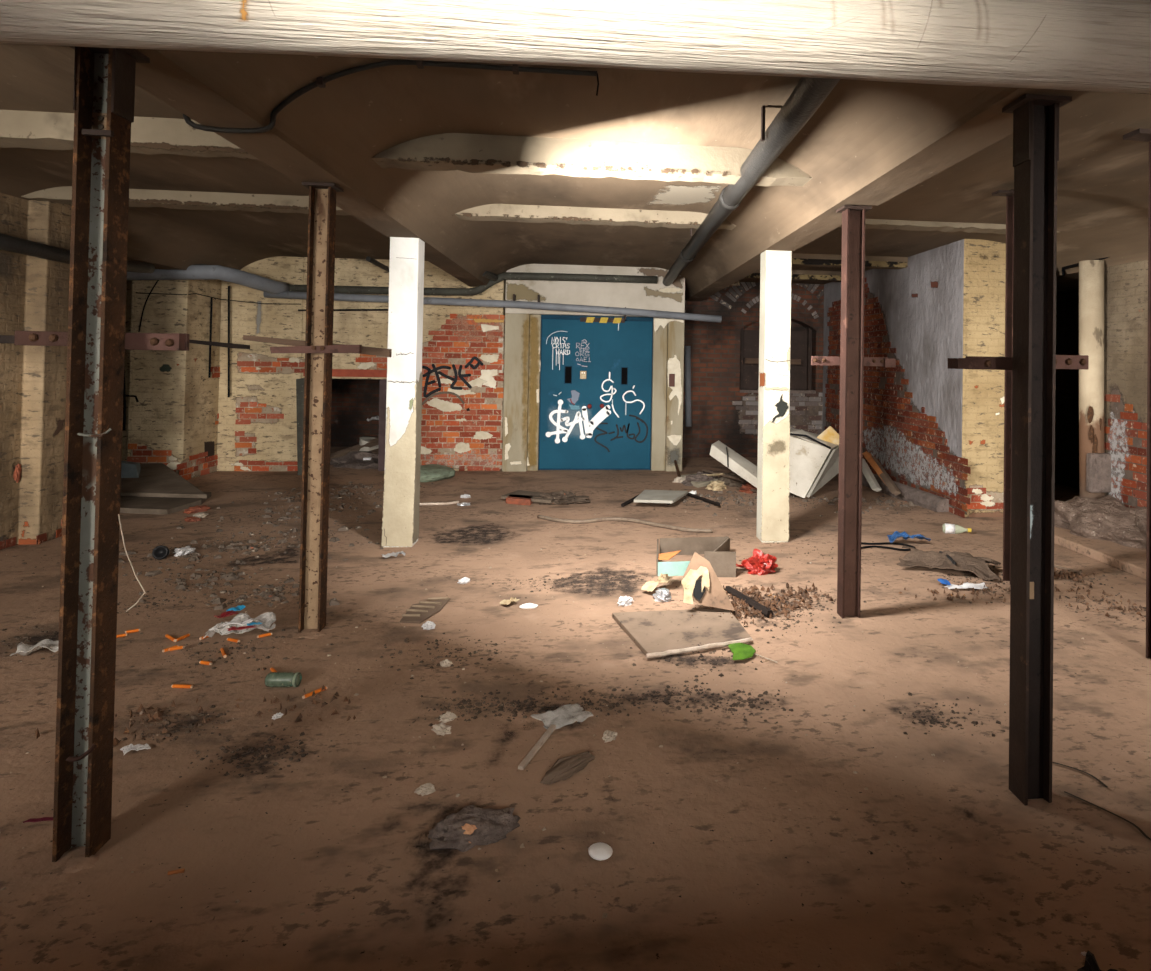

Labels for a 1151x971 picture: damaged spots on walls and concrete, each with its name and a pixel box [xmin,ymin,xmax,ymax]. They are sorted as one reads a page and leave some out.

peeling [791,258,841,281]
flaking render [355,354,387,370]
flaking render [381,314,530,547]
peeling [667,355,682,446]
peeling [732,300,841,542]
flaking render [862,261,1004,518]
flaking render [1104,386,1147,508]